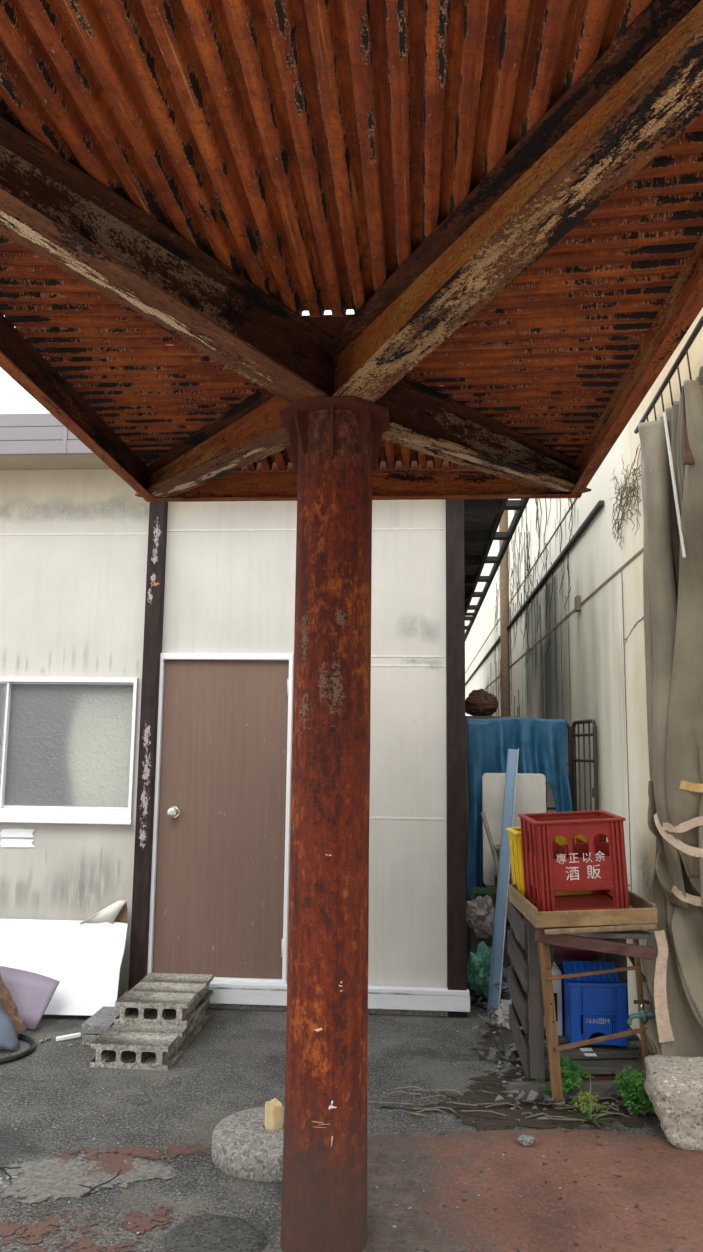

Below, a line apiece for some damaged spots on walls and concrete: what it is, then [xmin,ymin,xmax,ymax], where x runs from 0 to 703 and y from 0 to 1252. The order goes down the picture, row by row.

rust [69,0,93,38]
rust [273,0,305,117]
rust [396,0,408,60]
rust [436,0,449,90]
peeling [430,59,703,312]
peeling [0,210,272,382]
peeling [394,436,569,492]
peeling [147,516,161,603]
damp [522,577,579,719]
peeling [139,723,152,849]